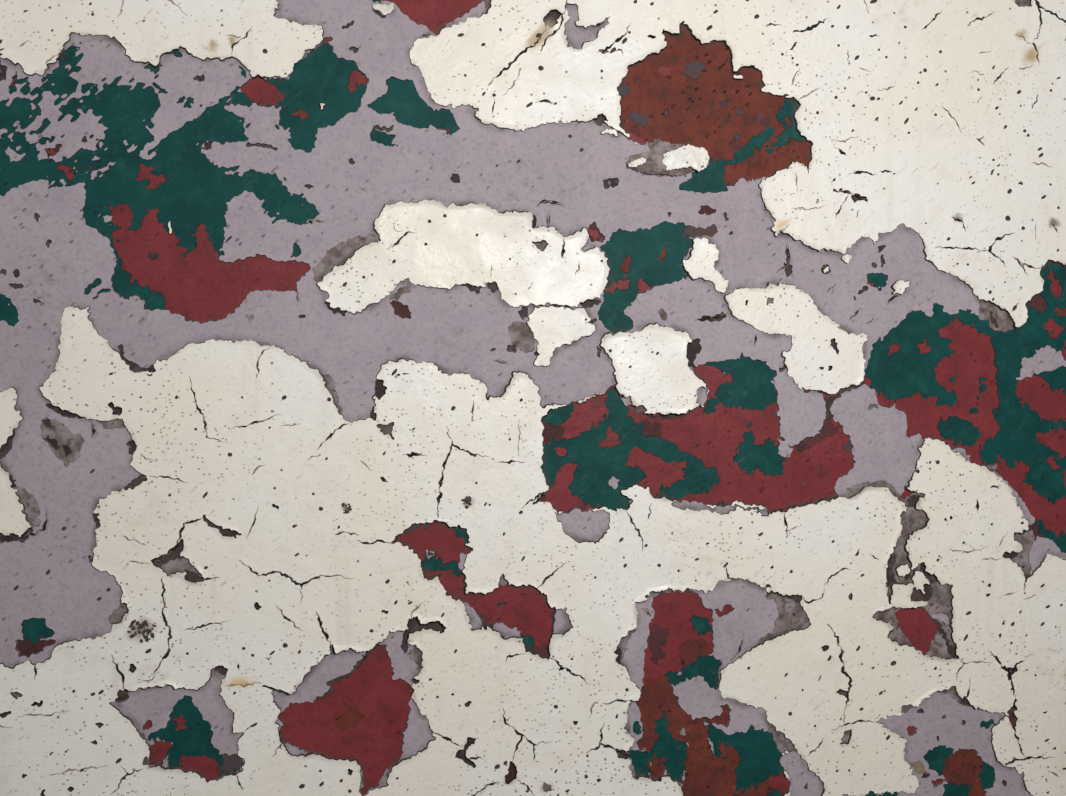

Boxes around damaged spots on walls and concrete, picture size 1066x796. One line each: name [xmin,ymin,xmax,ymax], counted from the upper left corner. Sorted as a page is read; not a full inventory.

crack [777,137,891,272]
crack [936,217,1057,274]
crack [406,425,524,519]
crack [112,518,231,690]
peeling [154,541,203,581]
crack [239,506,354,653]
peeling [392,520,573,658]
peeling [110,666,245,781]
peeling [263,617,442,796]
peeling [615,578,823,796]
crack [809,623,872,755]
peeling [865,686,1032,796]